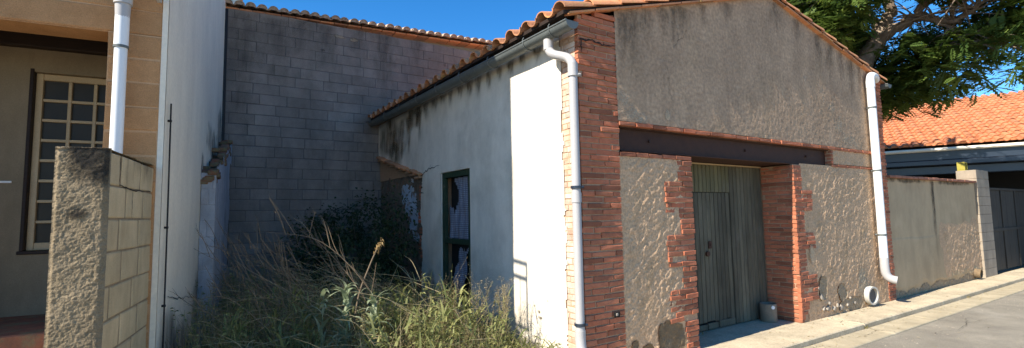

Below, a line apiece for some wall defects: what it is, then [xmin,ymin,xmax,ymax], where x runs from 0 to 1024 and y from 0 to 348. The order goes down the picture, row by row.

spalling [200,140,233,184]
flaking render [380,174,423,302]
flaking render [818,276,864,312]